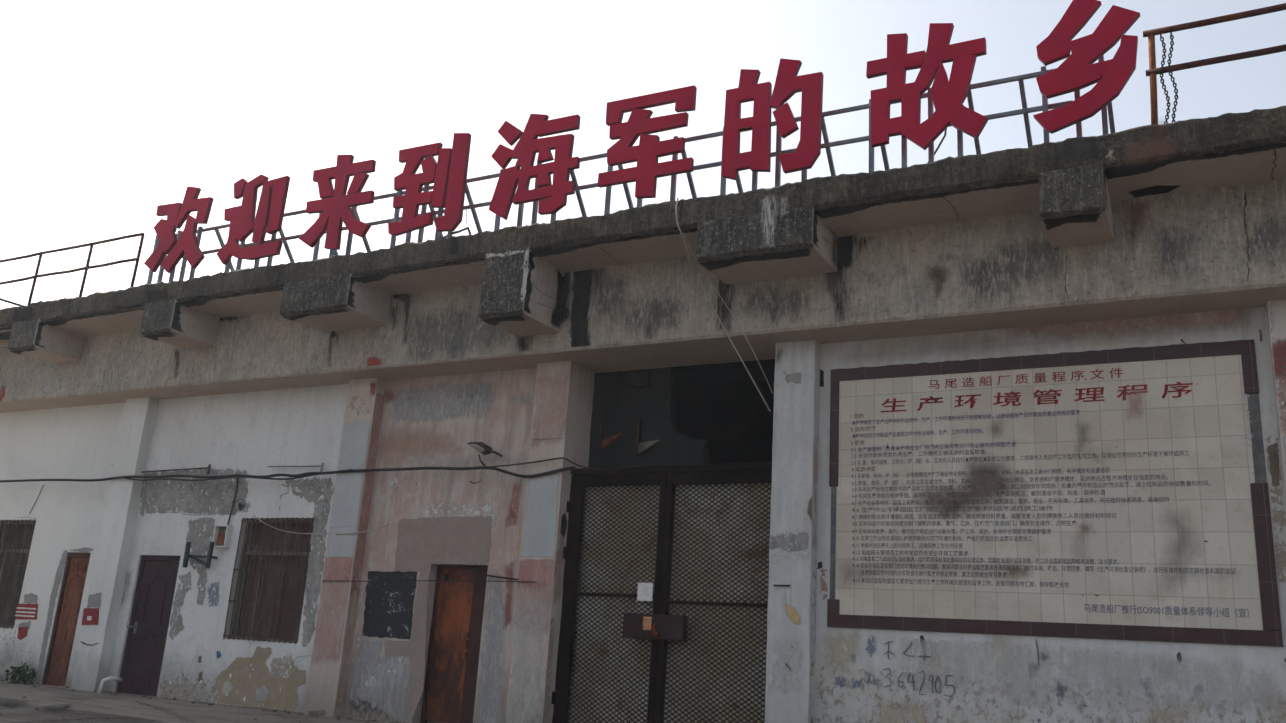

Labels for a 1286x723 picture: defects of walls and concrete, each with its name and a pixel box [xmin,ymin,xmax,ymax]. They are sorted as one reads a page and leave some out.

damp [283,237,485,327]
damp [391,228,697,358]
crack [1243,149,1277,282]
peeling [140,467,250,639]
peeling [285,477,334,647]
peeling [159,646,306,712]